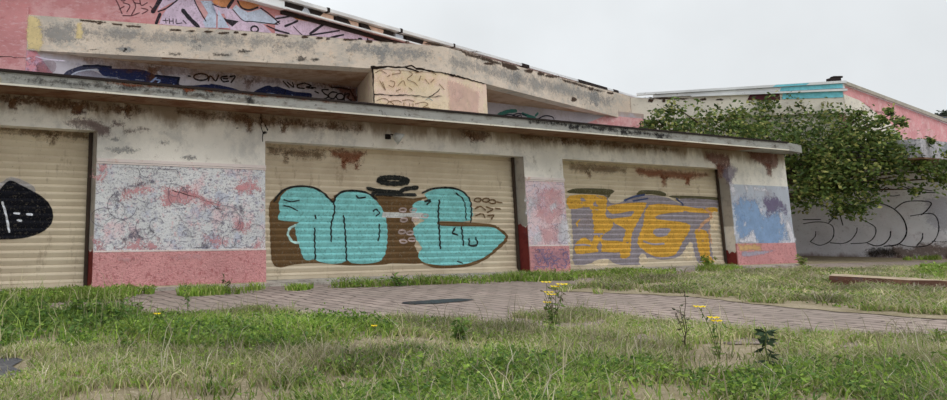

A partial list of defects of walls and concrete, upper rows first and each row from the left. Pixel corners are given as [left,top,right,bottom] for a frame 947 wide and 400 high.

water stain [0,95,141,117]
water stain [177,97,362,133]
corrosion [269,145,364,170]
corrosion [636,151,730,185]
peeling [112,180,221,209]
peeling [202,177,261,249]
peeling [729,184,795,257]